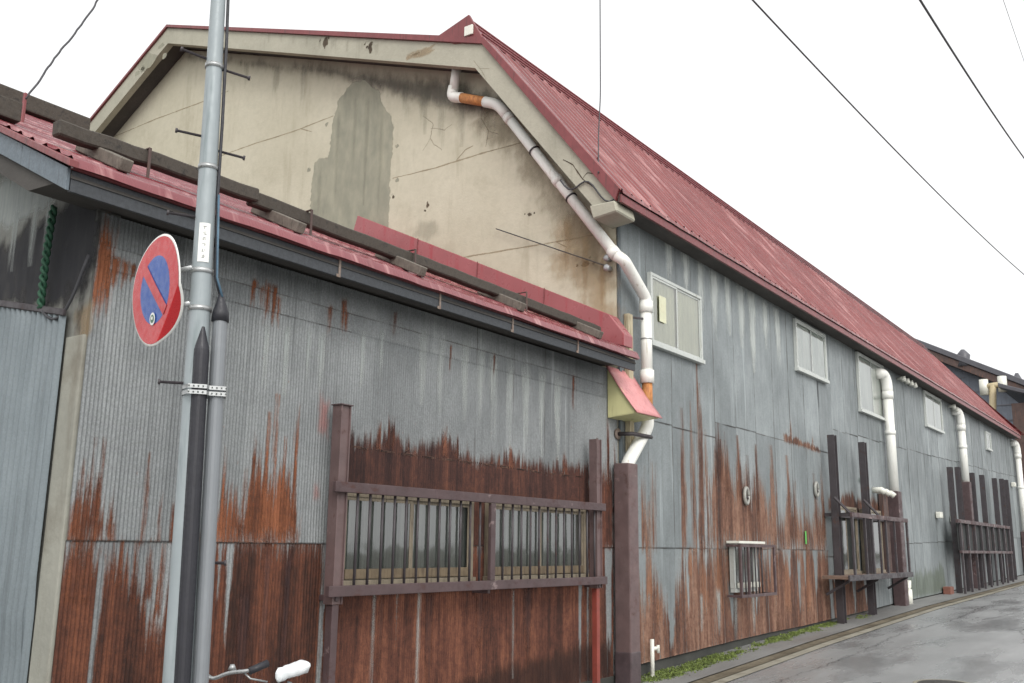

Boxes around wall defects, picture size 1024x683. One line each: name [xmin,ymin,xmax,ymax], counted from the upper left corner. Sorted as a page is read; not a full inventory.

peeling [307,80,399,230]
leakage [344,74,487,108]
rust [92,222,136,307]
rust [252,280,280,319]
rust [51,442,174,683]
rust [209,413,616,683]
rust [639,364,878,664]